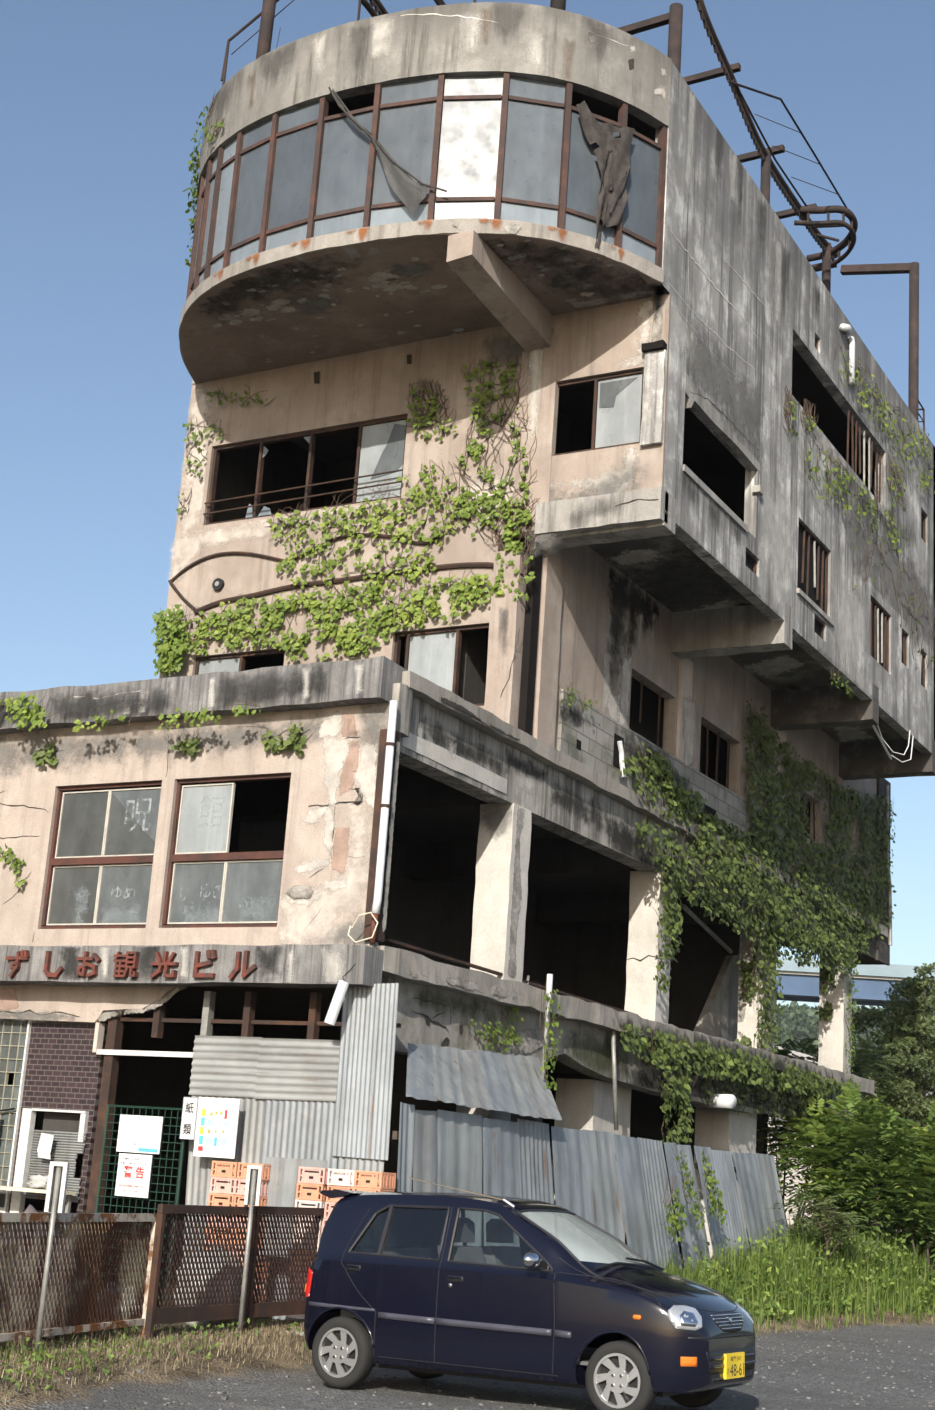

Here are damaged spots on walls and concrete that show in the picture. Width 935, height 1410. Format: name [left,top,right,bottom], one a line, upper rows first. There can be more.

water stain [354,24,387,61]
water stain [686,94,694,183]
water stain [717,128,743,214]
water stain [201,259,344,315]
water stain [483,239,662,367]
water stain [776,246,789,317]
water stain [691,333,760,460]
water stain [605,549,760,699]
water stain [51,688,167,716]
water stain [211,664,325,706]
flaking render [278,711,400,945]
water stain [419,726,811,936]